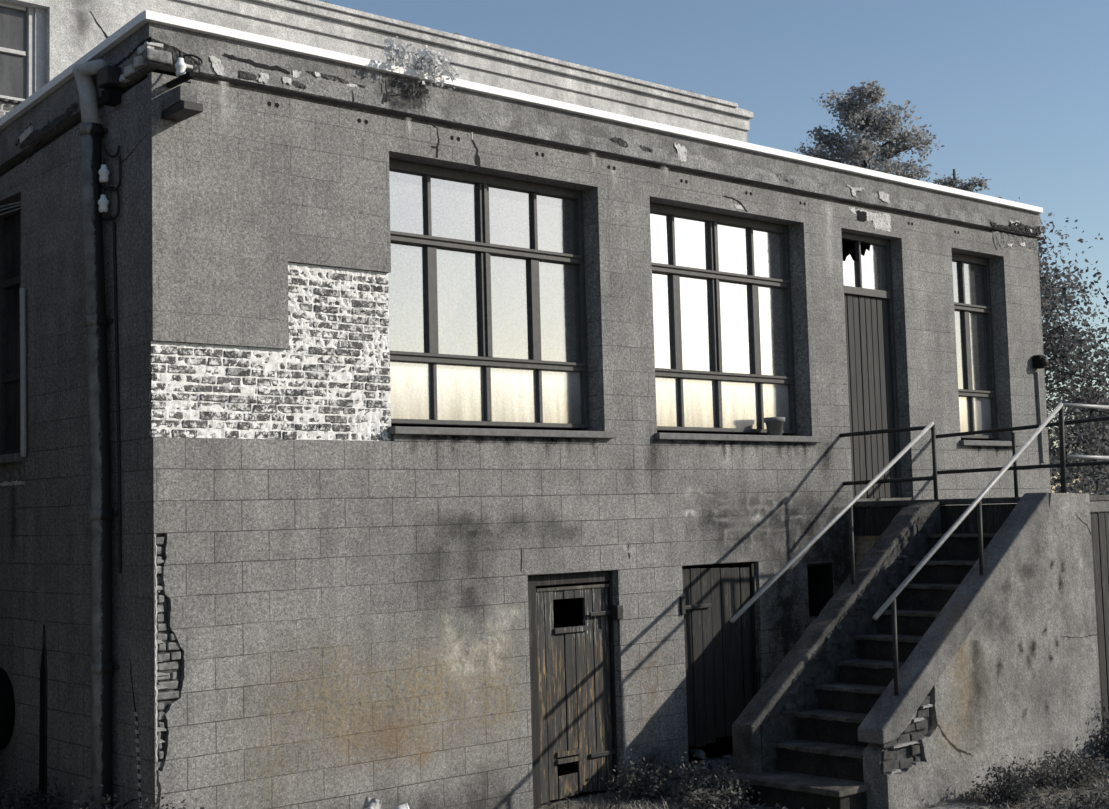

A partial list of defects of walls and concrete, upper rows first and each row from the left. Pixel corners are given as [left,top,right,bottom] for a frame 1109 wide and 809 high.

spalling [114,36,225,83]
spalling [238,71,269,83]
spalling [283,70,366,89]
spalling [845,182,891,232]
spalling [989,219,1042,250]
peeling [149,262,391,441]
spalling [155,533,182,771]
water stain [446,643,500,676]
spalling [761,516,938,774]